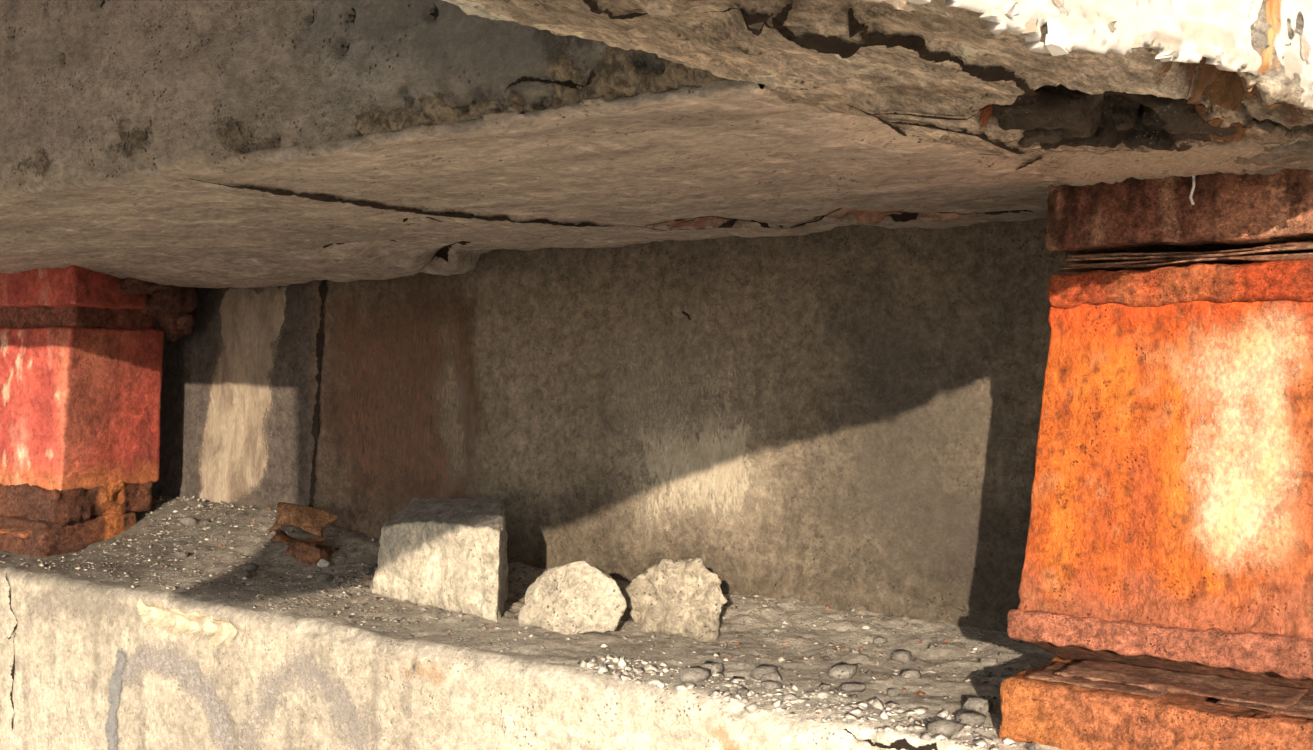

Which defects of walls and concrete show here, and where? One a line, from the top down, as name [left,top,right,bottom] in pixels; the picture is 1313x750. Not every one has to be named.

water stain [474,30,586,94]
crack [583,0,648,20]
water stain [629,53,665,75]
crack [704,2,1043,170]
peeling [980,0,1070,56]
spalling [992,35,1313,187]
rust [1258,0,1282,75]
crack [186,178,842,262]
rust [1058,240,1313,272]
rust [118,277,199,342]
rust [1025,659,1313,719]
crack [844,728,938,750]